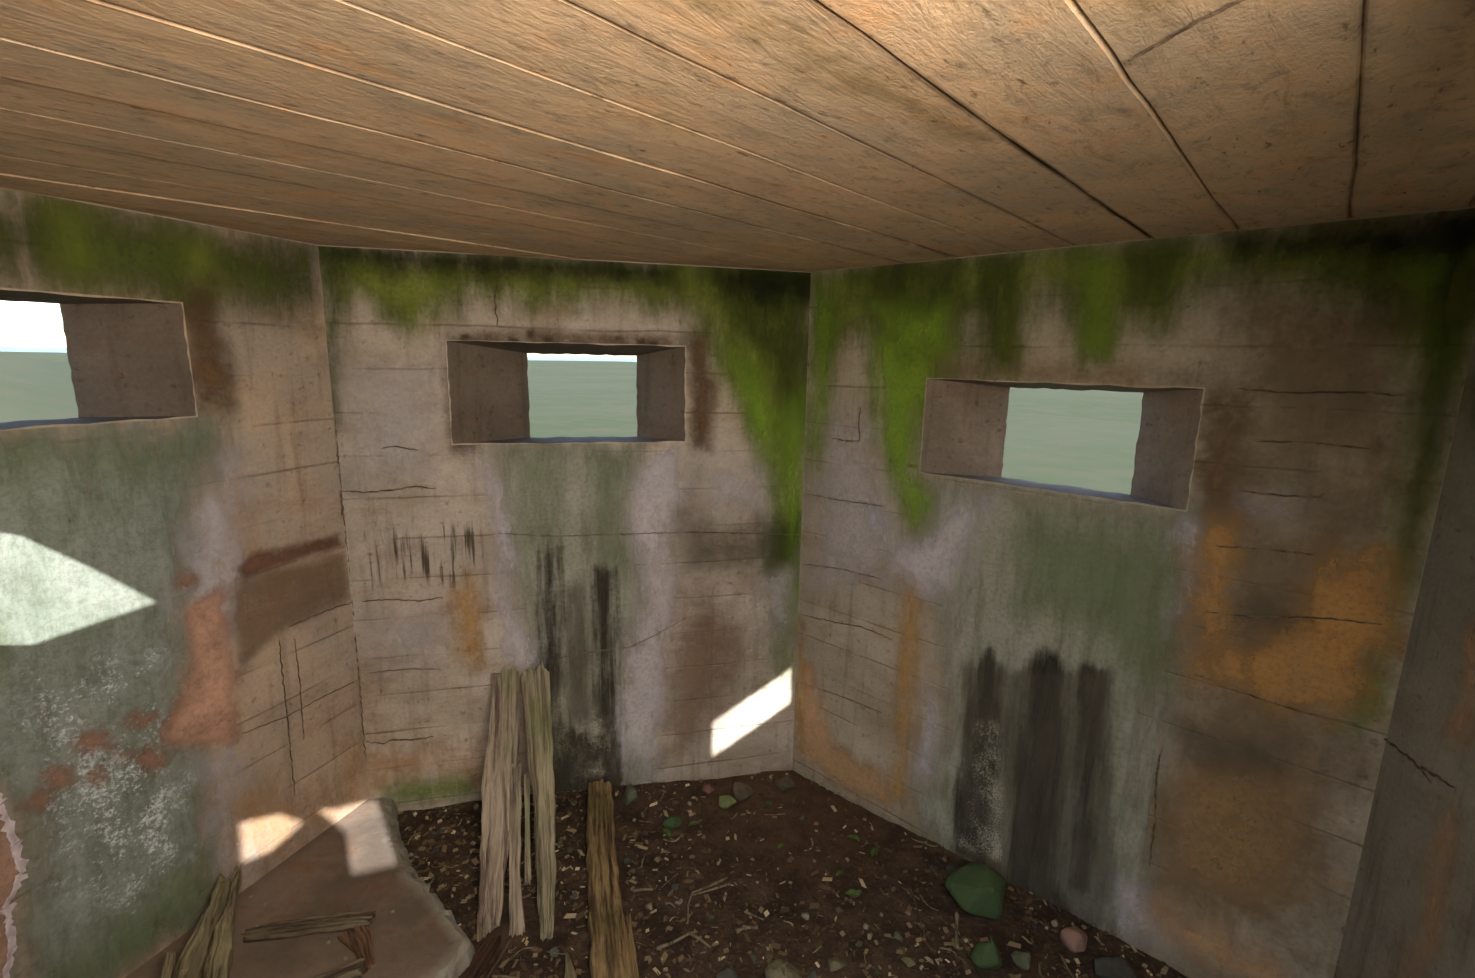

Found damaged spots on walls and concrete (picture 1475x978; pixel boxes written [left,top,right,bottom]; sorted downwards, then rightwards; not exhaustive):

crack [1128,0,1245,62]
water stain [485,444,729,793]
water stain [692,257,1376,942]
peeling [0,793,30,978]